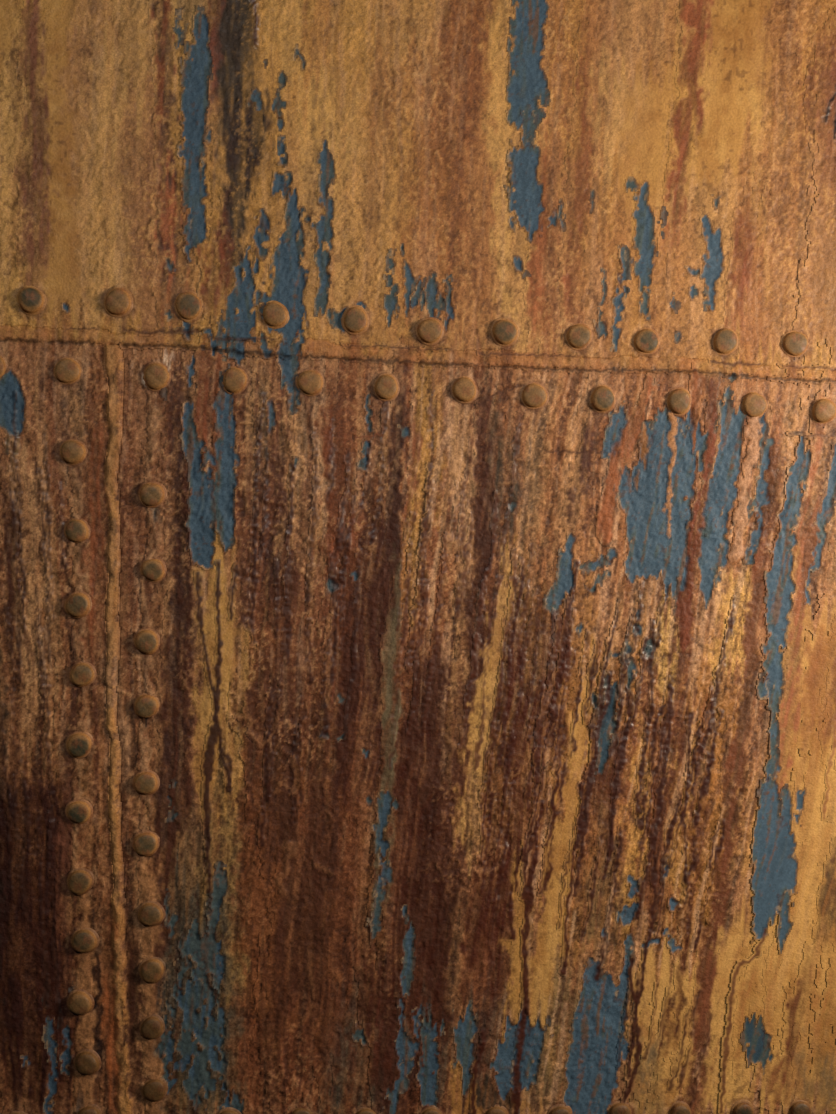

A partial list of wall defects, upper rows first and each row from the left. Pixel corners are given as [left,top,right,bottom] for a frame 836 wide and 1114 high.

rust [146,0,280,346]
peeling [160,5,370,570]
peeling [504,0,567,244]
peeling [593,176,669,352]
rust [654,0,720,275]
peeling [669,194,725,314]
water stain [786,35,836,394]
rust [0,365,115,1114]
rust [143,335,836,1114]
peeling [545,372,836,954]
rust [97,868,146,1114]
peeling [563,874,683,1114]